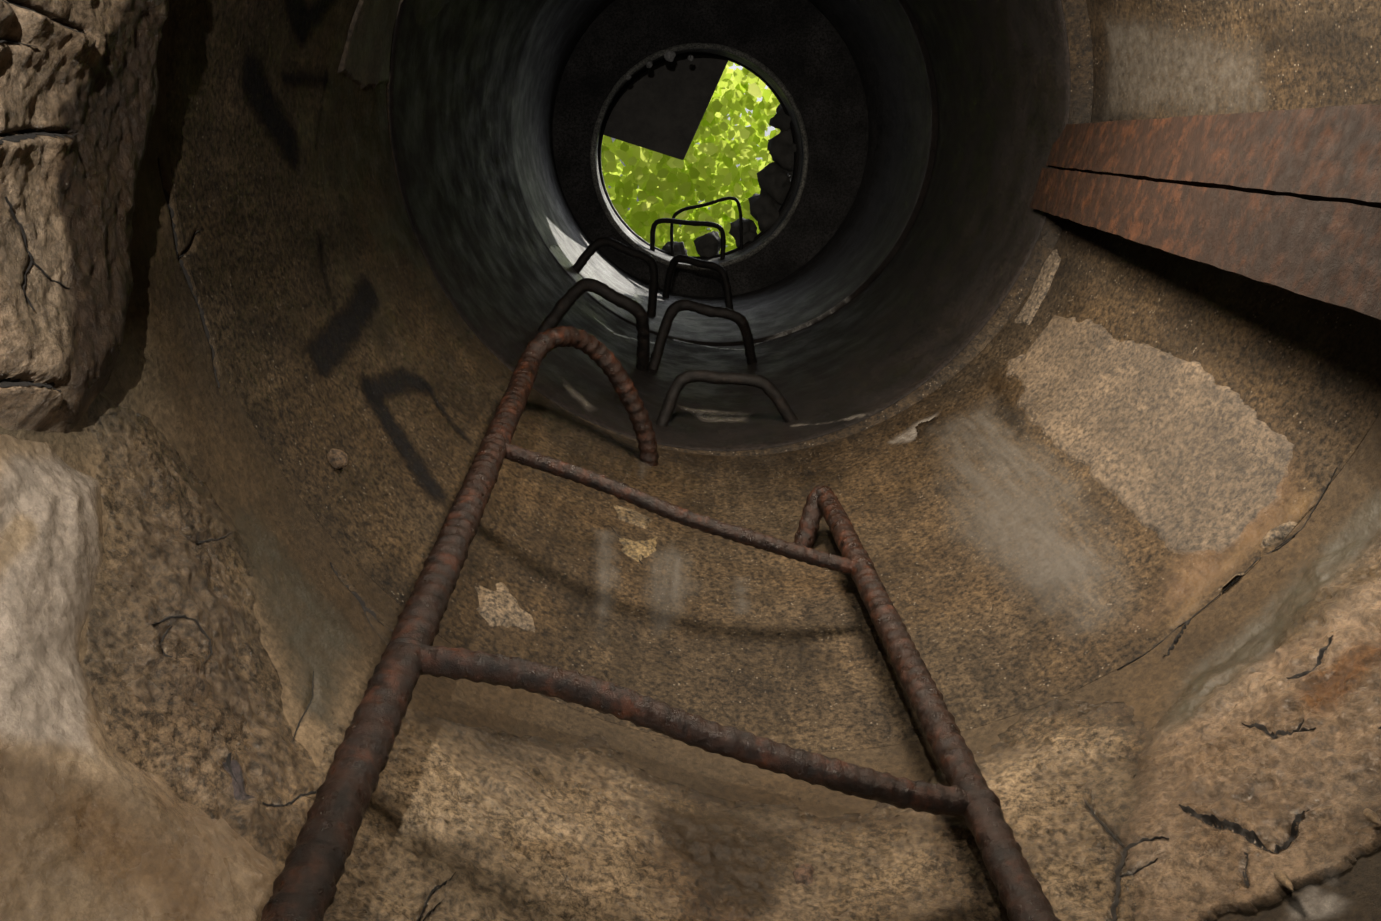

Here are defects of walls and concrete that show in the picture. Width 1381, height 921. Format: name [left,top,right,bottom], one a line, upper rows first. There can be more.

peeling [1006,248,1297,555]
crack [1286,635,1333,679]
crack [1241,719,1316,739]
water stain [323,708,1010,921]
crack [1083,797,1310,921]